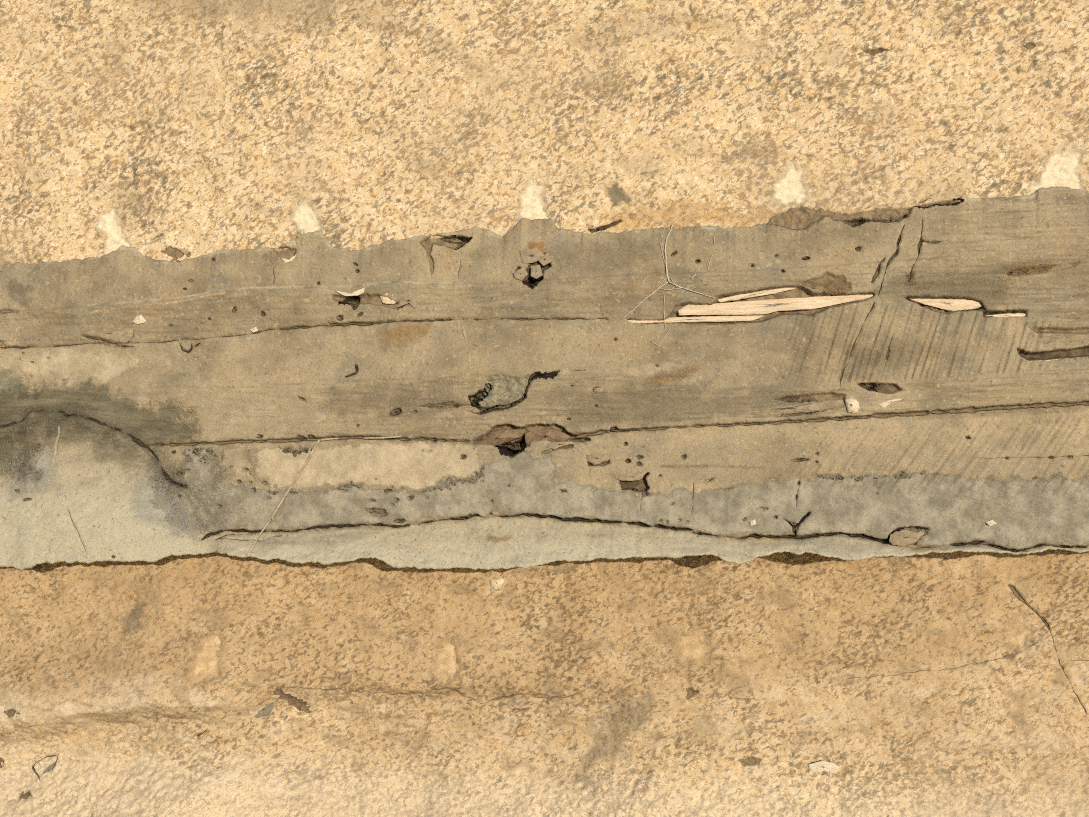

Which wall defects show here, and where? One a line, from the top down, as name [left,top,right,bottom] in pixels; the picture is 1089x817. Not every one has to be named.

spalling [513,248,552,289]
spalling [628,271,877,324]
crack [574,221,1089,438]
spalling [390,371,558,416]
crack [468,370,597,414]
crack [0,409,469,487]
spalling [473,418,590,459]
spalling [587,454,661,496]
crack [201,482,1087,552]
crack [849,584,1089,714]